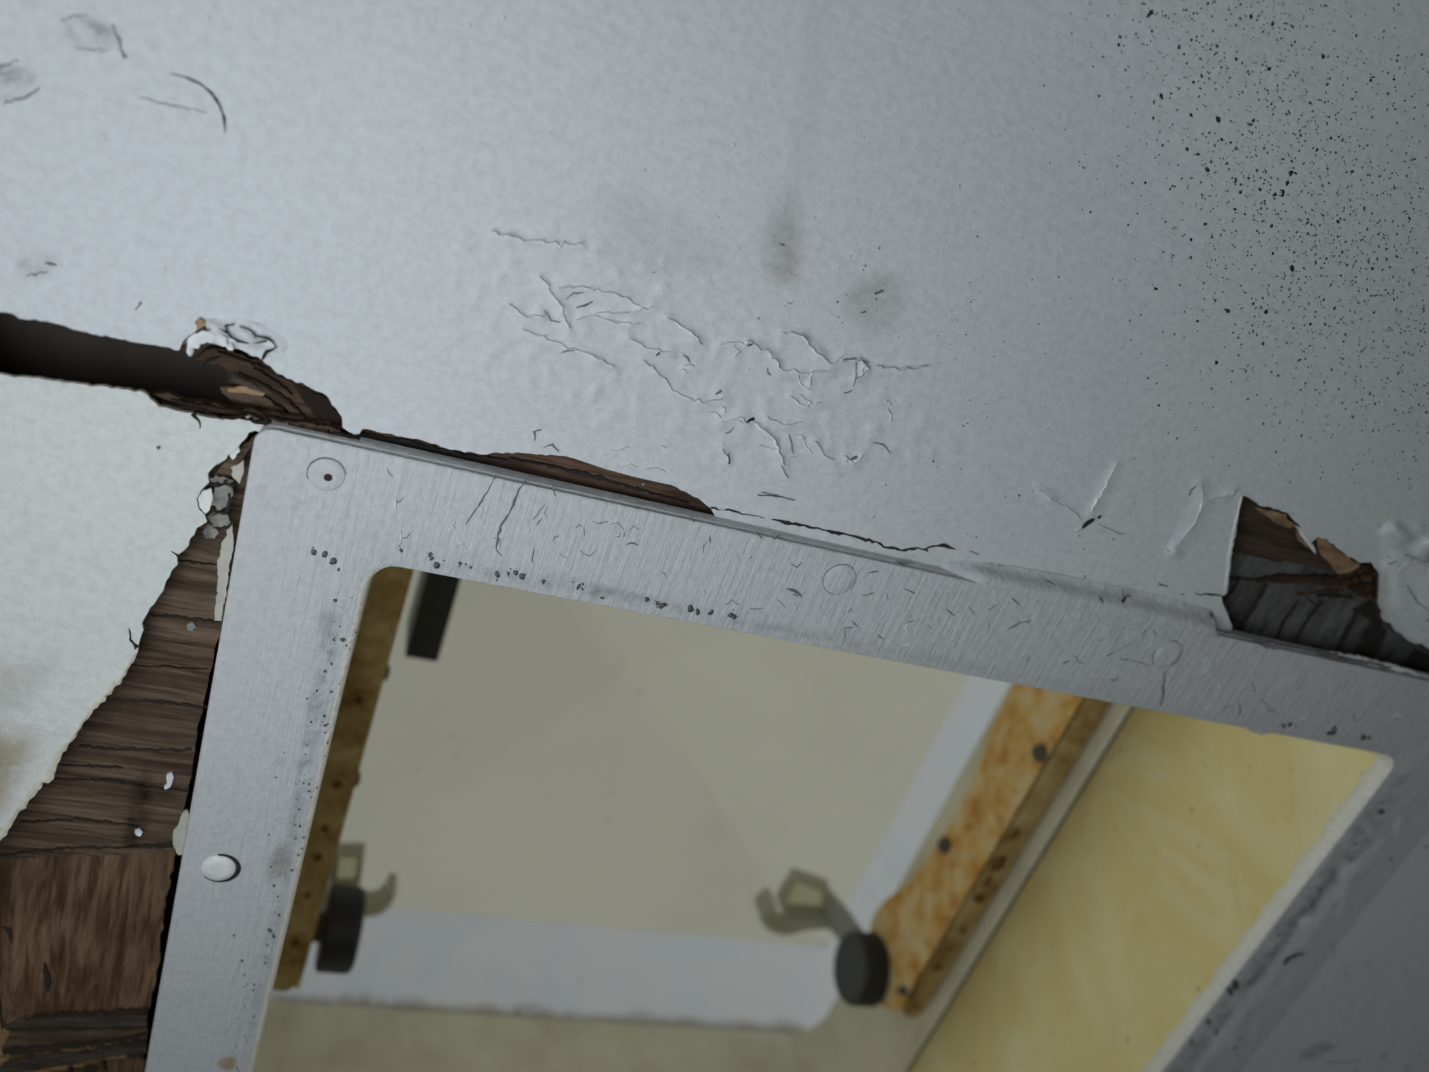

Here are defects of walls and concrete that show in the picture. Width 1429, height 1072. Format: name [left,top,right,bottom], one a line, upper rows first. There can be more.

water stain [1078,0,1429,493]
crack [544,292,593,353]
crack [170,350,1178,706]
peeling [1255,507,1297,528]
peeling [1317,537,1361,574]
peeling [0,372,264,841]
peeling [1330,651,1429,677]
peeling [173,809,189,855]
corrosion [972,828,1021,903]